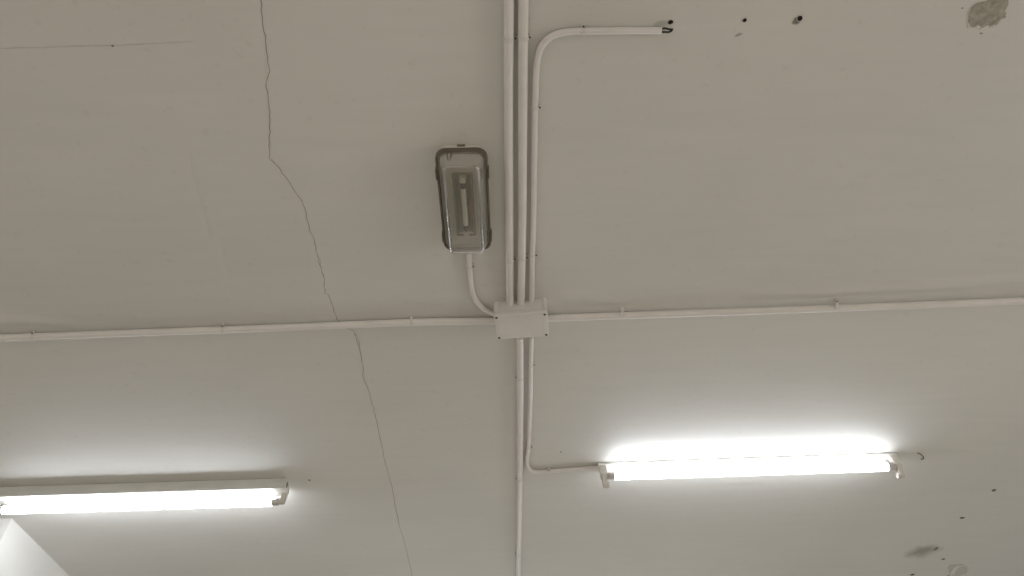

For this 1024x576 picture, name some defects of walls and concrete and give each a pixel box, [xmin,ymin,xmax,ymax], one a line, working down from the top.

crack [261,1,412,575]